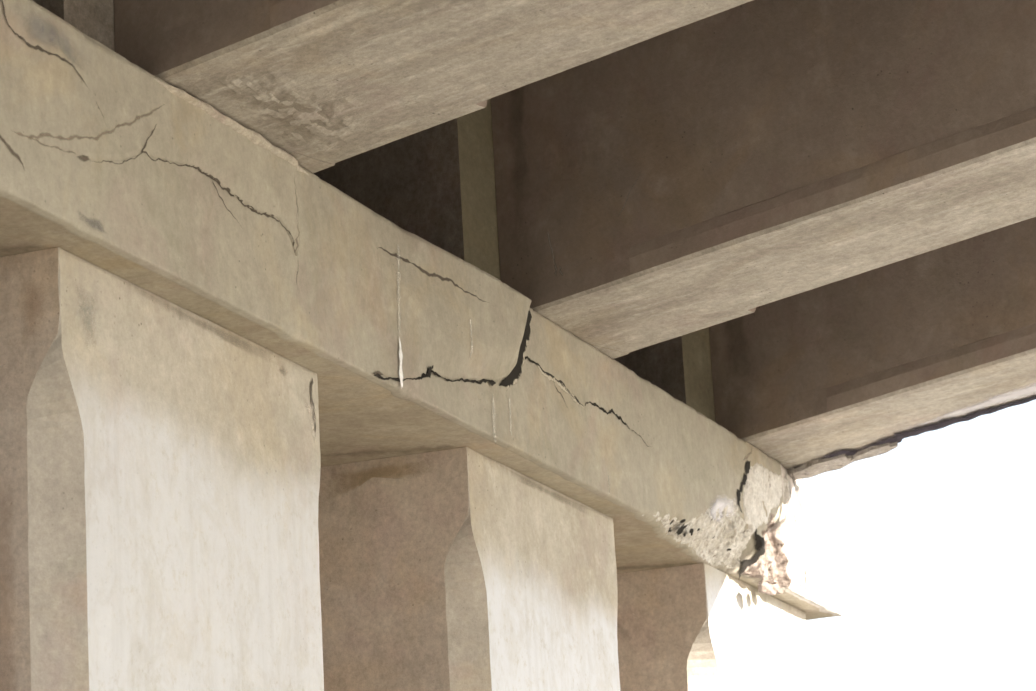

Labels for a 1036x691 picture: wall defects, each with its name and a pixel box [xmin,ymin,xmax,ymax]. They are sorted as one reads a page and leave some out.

crack [1,0,89,89]
crack [79,124,295,246]
crack [379,247,489,303]
crack [309,378,317,434]
crack [374,310,649,447]
spalling [668,519,712,537]